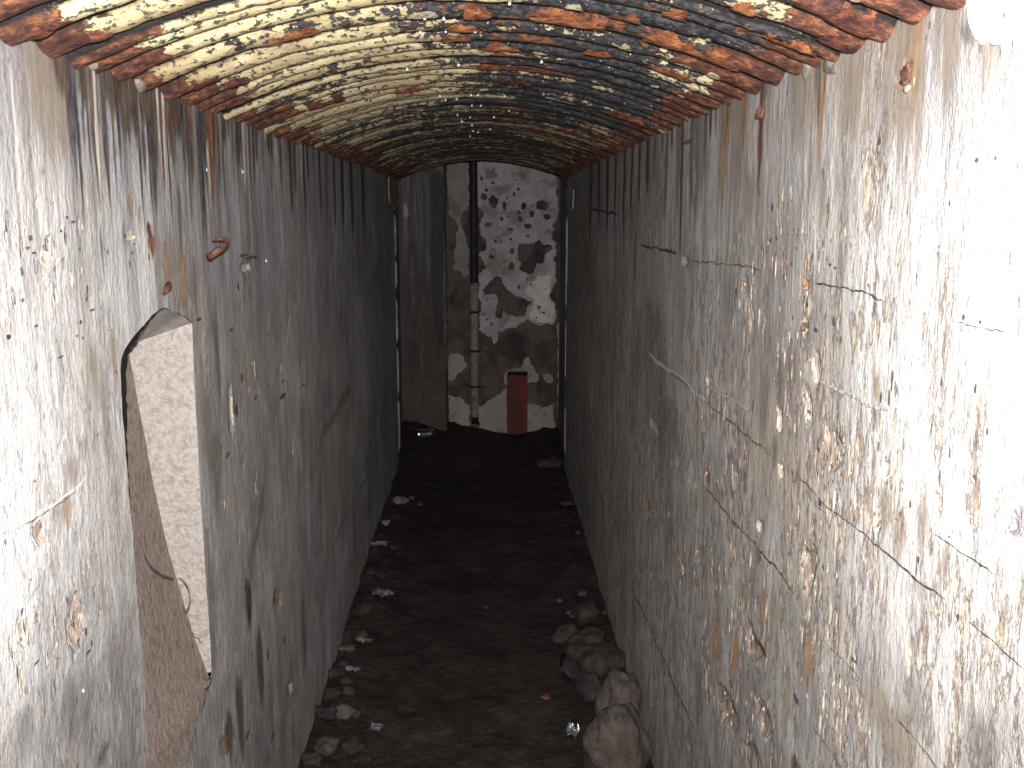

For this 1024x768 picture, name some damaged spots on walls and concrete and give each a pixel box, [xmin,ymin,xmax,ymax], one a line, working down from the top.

corrosion [307,95,346,111]
peeling [407,11,438,19]
corrosion [440,2,534,87]
corrosion [528,6,739,72]
corrosion [646,65,695,84]
corrosion [899,15,926,147]
peeling [446,160,574,453]
crack [641,244,760,271]
crack [816,283,882,301]
crack [671,373,770,455]
crack [707,490,794,595]
crack [800,479,1022,668]